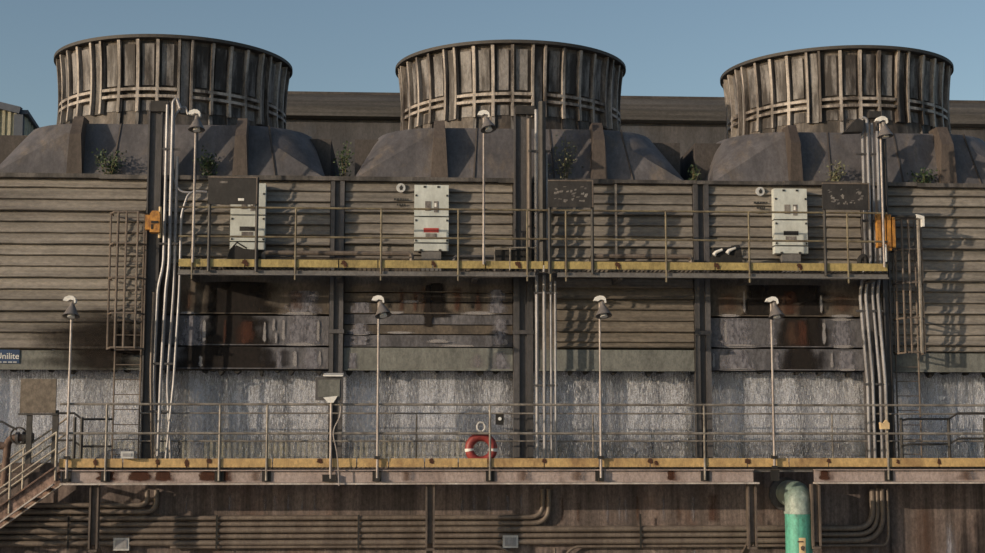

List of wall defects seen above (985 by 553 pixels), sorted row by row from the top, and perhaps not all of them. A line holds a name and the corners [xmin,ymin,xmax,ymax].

damp [176,282,286,368]
damp [743,285,828,371]
rust [128,471,172,481]
rust [199,471,231,481]